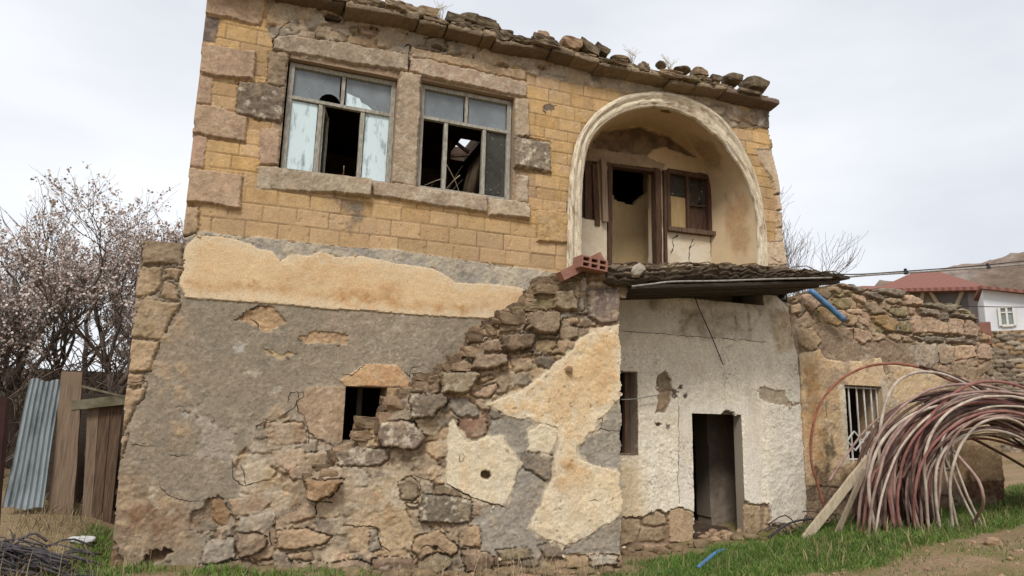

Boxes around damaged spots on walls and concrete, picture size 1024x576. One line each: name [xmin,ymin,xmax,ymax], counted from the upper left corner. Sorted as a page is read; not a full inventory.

peeling [589,126,696,157]
peeling [178,230,604,290]
spalling [236,305,287,332]
spalling [264,330,349,359]
peeling [655,370,687,430]
peeling [757,385,800,408]
crack [259,391,332,445]
crack [232,459,262,486]
peeling [471,393,695,561]